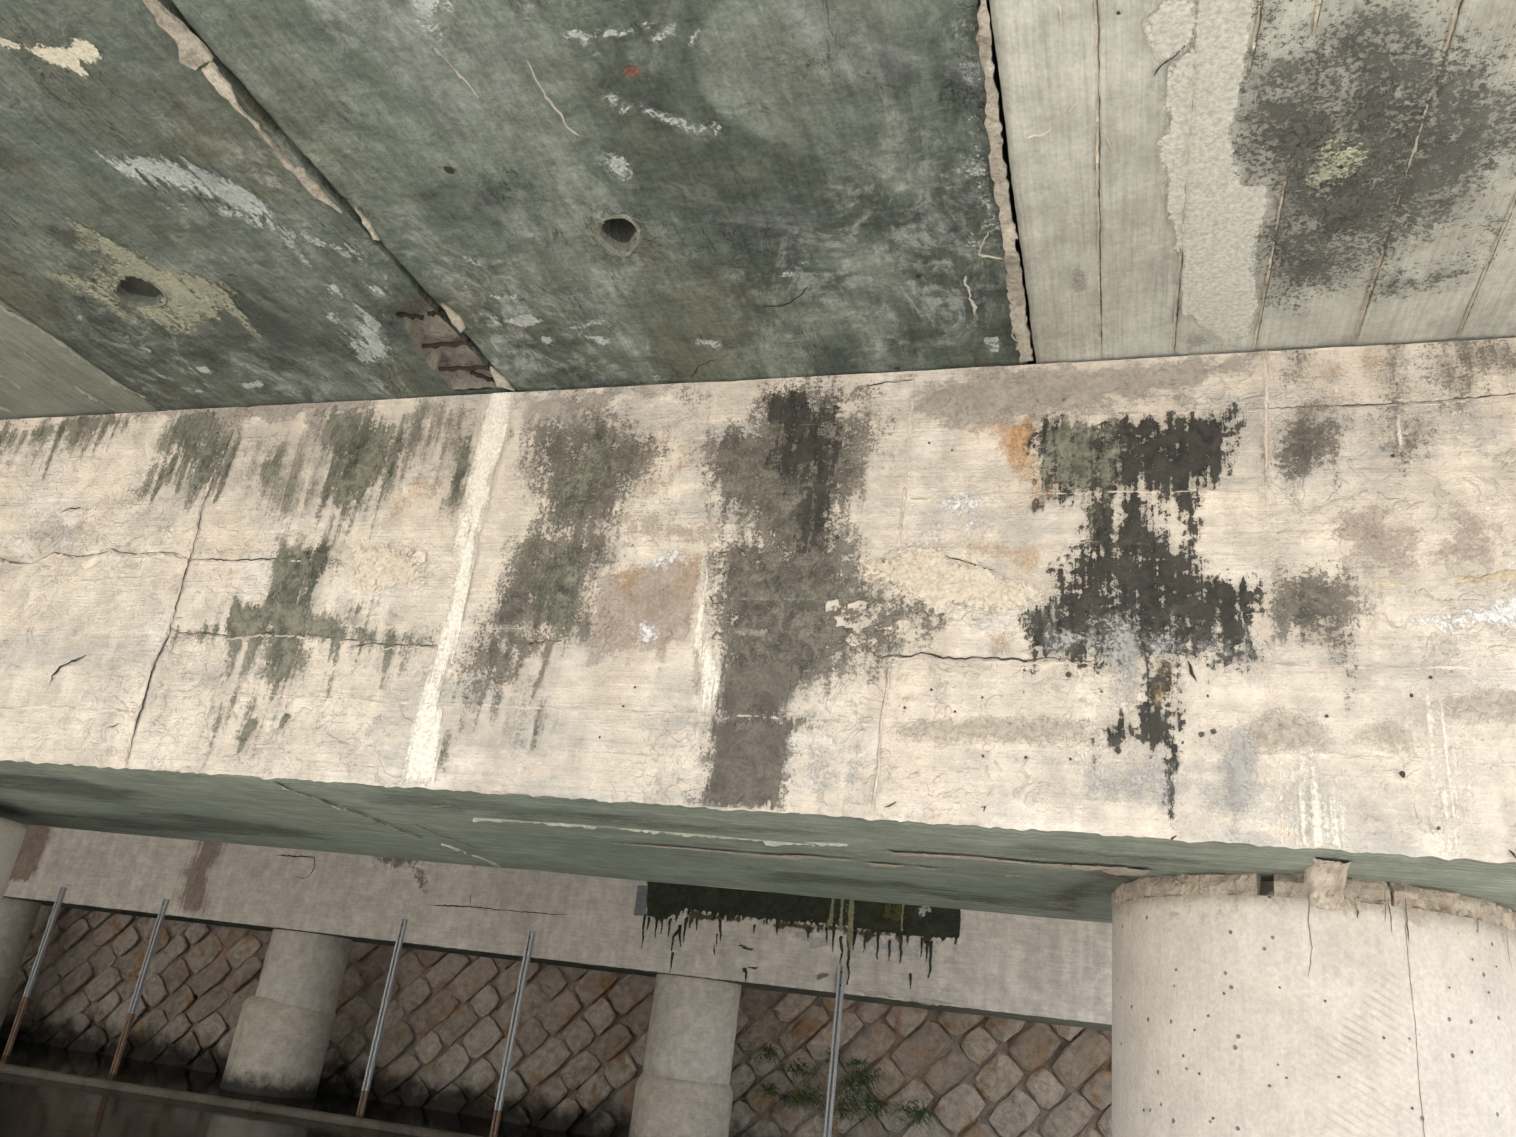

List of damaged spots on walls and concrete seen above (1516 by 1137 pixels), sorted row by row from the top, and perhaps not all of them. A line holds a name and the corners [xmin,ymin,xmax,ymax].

damp [1143,0,1516,356]
spalling [395,295,497,390]
damp [984,337,1000,353]
damp [1375,325,1516,446]
damp [315,423,403,518]
crack [0,431,438,766]
damp [261,542,330,634]
damp [685,375,959,811]
damp [1018,399,1374,829]
damp [1299,765,1345,849]
damp [641,847,1216,989]
crack [1355,896,1425,1137]